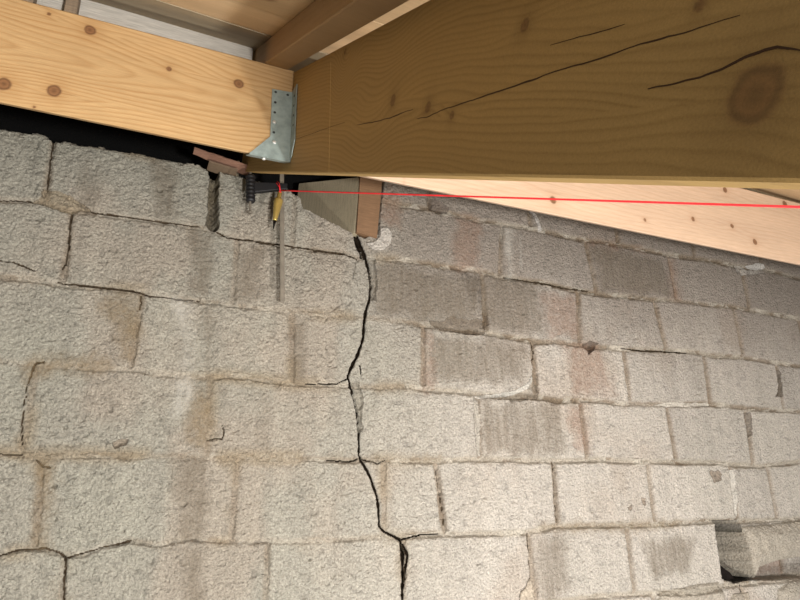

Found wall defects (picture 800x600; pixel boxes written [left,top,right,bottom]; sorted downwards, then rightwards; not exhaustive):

crack [297,15,740,139]
crack [648,45,800,89]
crack [0,142,54,206]
spalling [205,174,219,232]
crack [57,212,444,600]
crack [0,540,132,600]